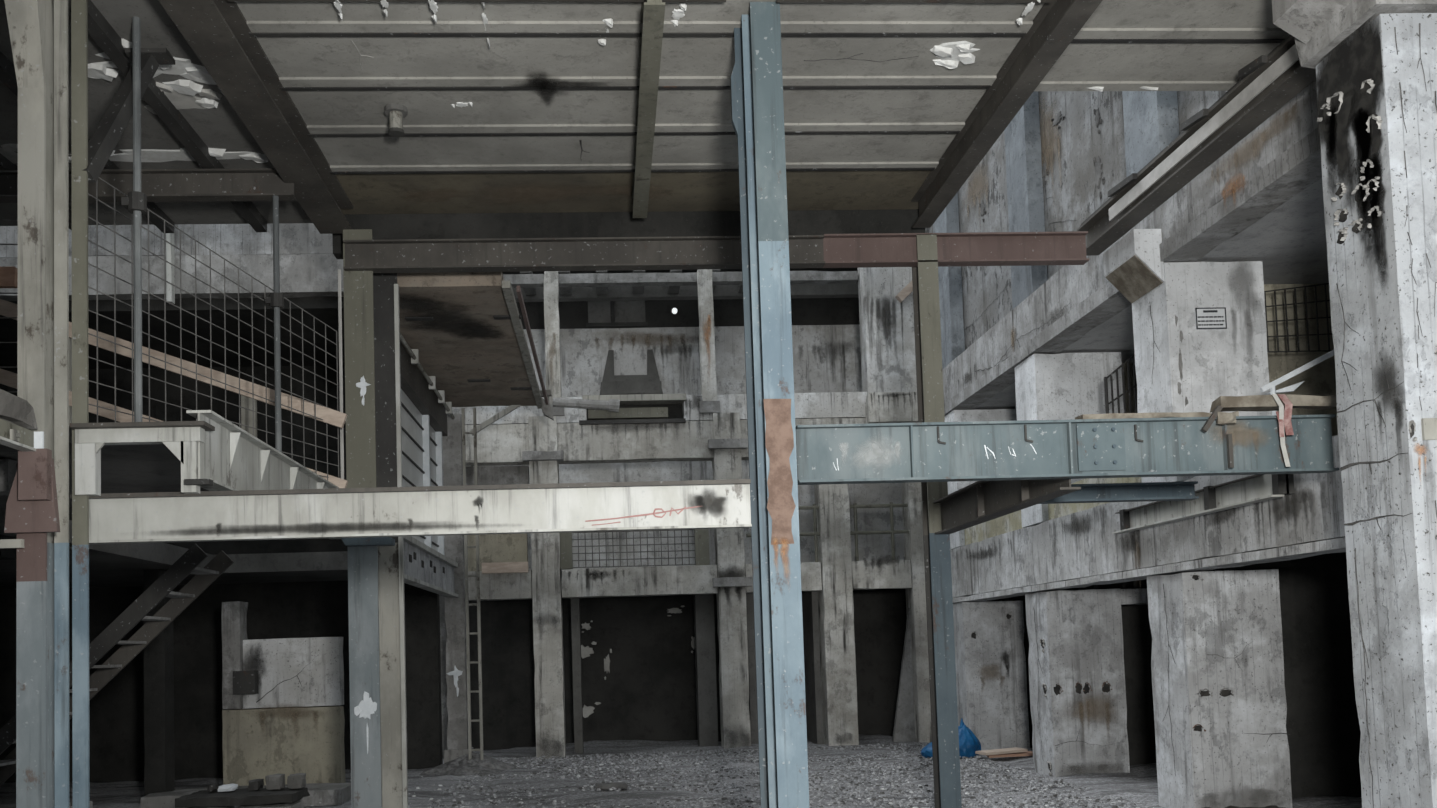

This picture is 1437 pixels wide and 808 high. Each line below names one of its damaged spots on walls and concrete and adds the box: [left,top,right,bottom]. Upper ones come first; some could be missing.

flaking render [88,52,119,82]
flaking render [153,57,224,110]
flaking render [930,41,980,69]
spalling [1317,92,1343,122]
spalling [1360,79,1375,95]
spalling [1331,114,1383,244]
damp [864,297,903,338]
corrosion [763,399,796,565]